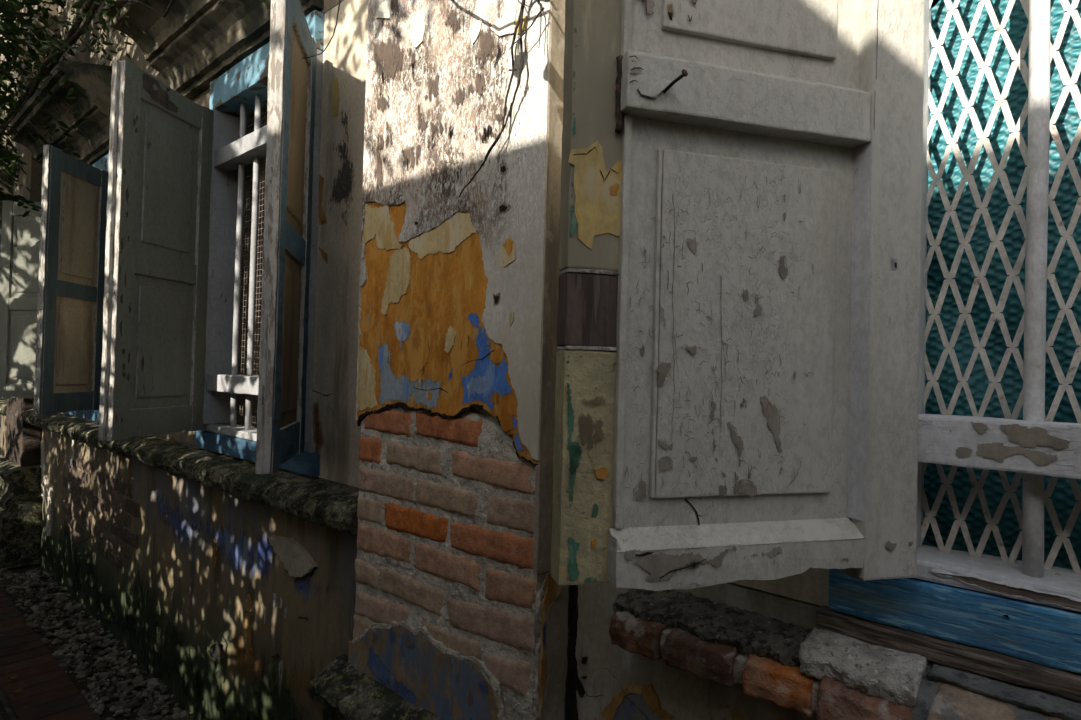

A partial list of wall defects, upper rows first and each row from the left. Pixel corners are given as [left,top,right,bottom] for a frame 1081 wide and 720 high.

damp [445,9,466,31]
damp [448,25,495,110]
damp [372,38,453,190]
damp [473,102,514,144]
damp [440,160,463,195]
peeling [568,140,622,250]
peeling [630,280,801,497]
flaking render [352,203,561,720]
peeling [578,397,609,480]
peeling [956,422,1070,466]
flaking render [40,439,141,571]
peeling [625,546,782,581]